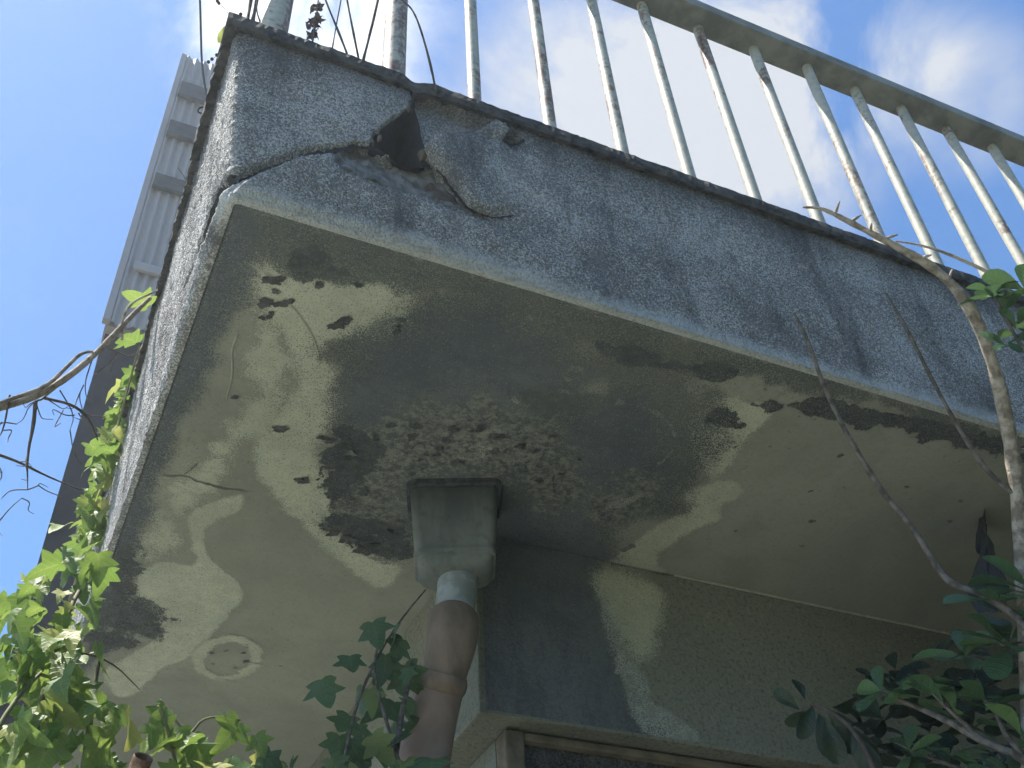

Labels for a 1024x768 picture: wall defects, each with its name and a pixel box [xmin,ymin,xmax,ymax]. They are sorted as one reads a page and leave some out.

crack [192,160,291,271]
spalling [301,105,547,217]
water stain [77,204,1002,743]
peeling [103,247,1004,698]